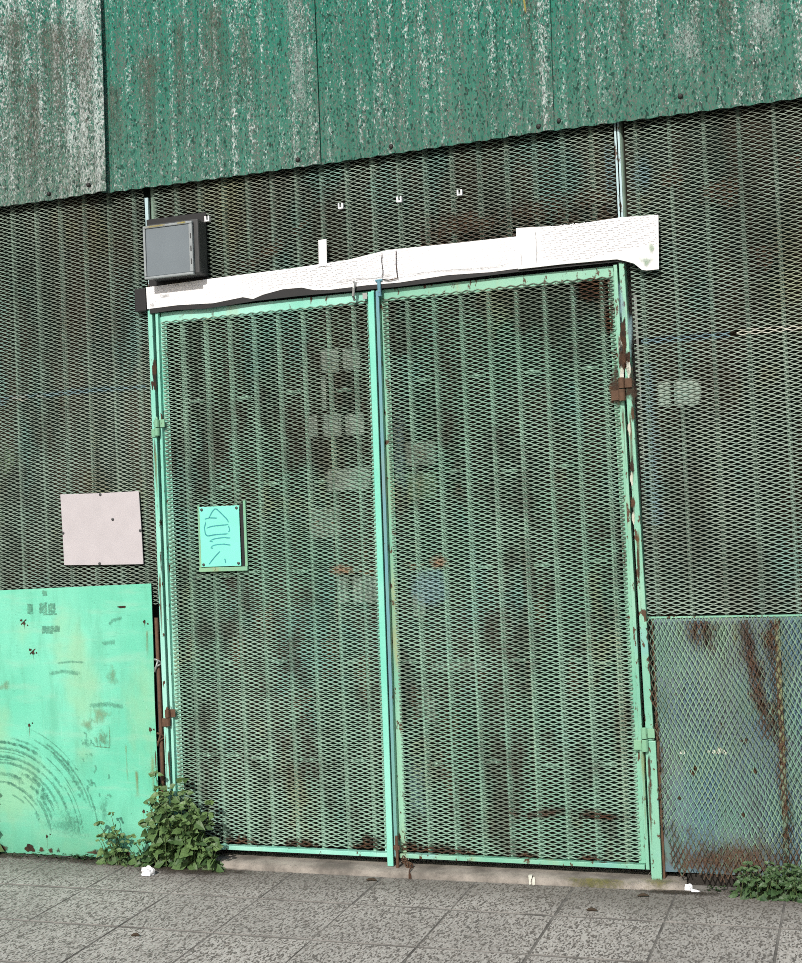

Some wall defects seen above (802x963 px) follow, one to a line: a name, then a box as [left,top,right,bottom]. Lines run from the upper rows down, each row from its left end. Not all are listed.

corrosion [576,277,614,334]
corrosion [609,340,637,486]
corrosion [646,628,662,829]
corrosion [670,620,800,883]